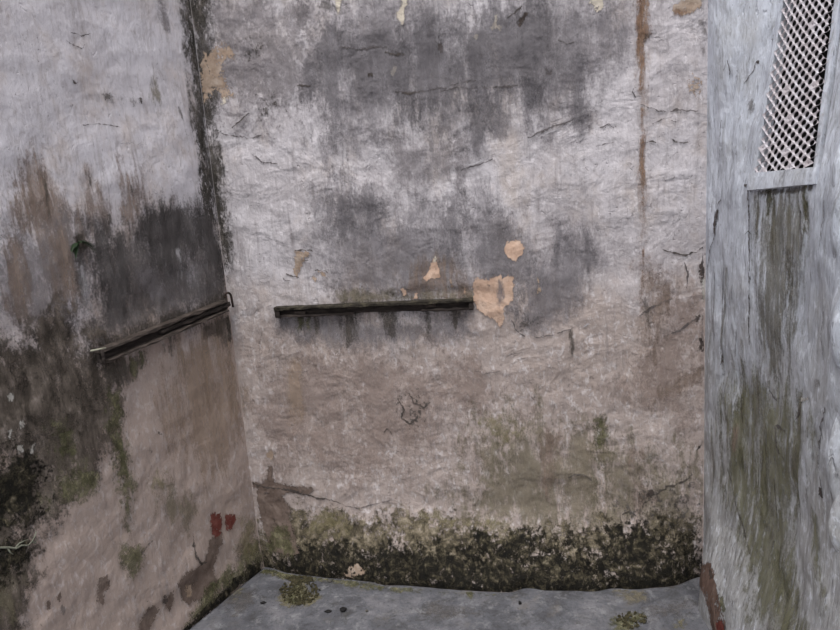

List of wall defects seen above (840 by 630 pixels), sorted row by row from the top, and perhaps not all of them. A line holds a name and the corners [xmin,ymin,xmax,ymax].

peeling [672,0,702,16]
peeling [200,41,236,105]
corrosion [632,0,650,98]
peeling [283,249,313,281]
leakage [0,0,627,630]
peeling [423,256,453,287]
peeling [464,274,515,327]
peeling [504,240,524,262]
leakage [755,185,812,379]
leakage [616,270,704,442]
leakage [452,416,745,560]